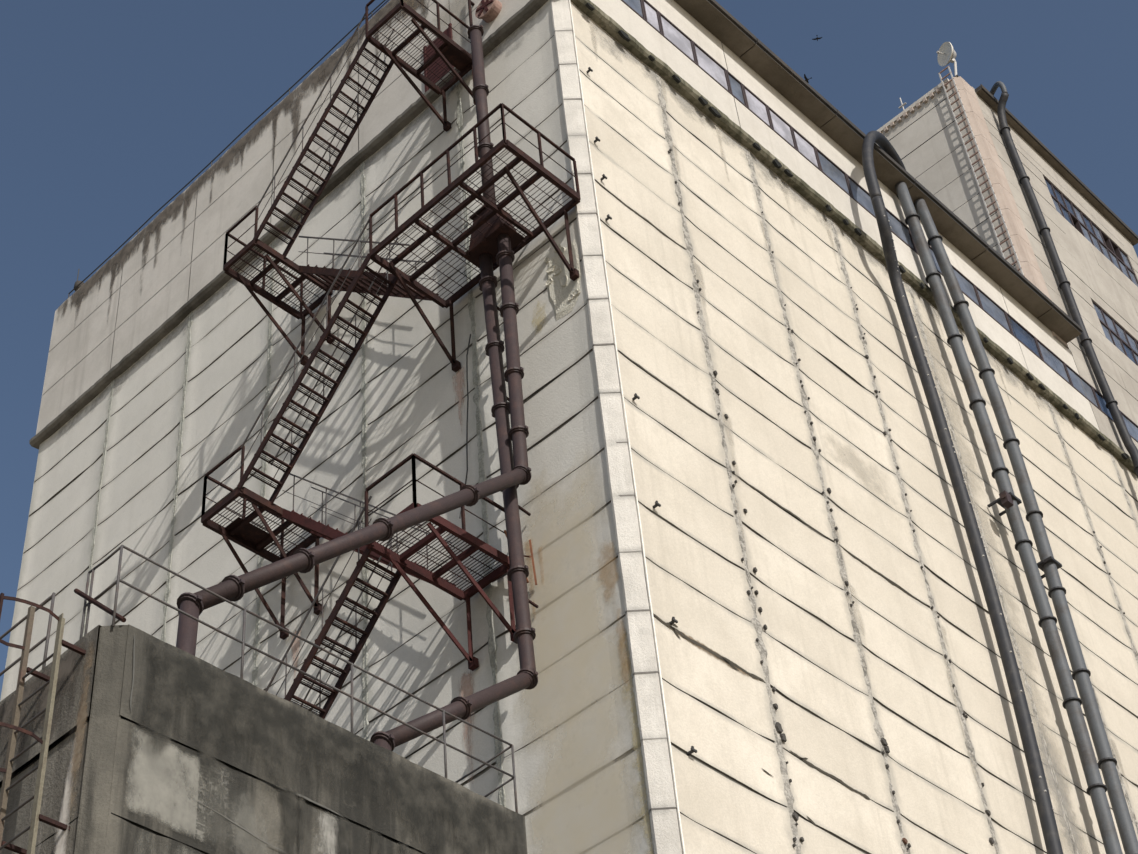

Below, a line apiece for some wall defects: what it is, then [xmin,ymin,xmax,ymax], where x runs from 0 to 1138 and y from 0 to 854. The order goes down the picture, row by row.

damp [62,0,428,313]
damp [127,643,517,854]